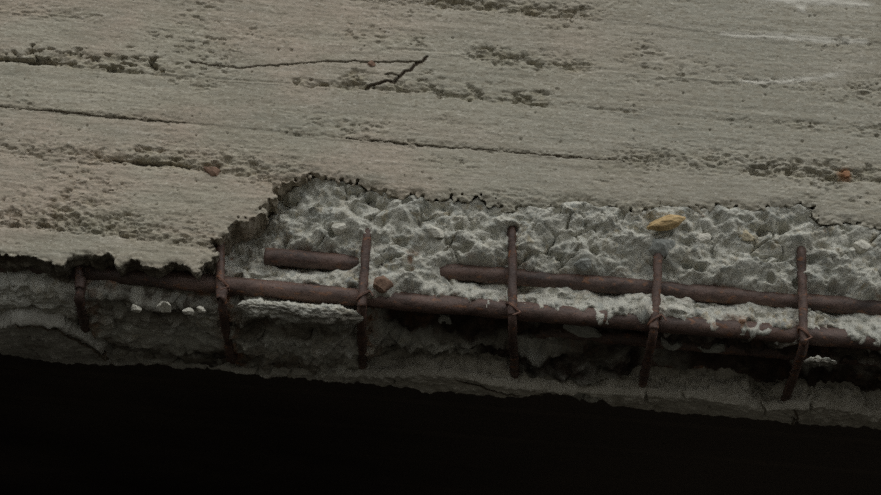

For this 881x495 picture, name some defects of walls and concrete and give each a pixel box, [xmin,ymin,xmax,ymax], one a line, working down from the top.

crack [190,56,428,90]
spalling [0,177,881,403]